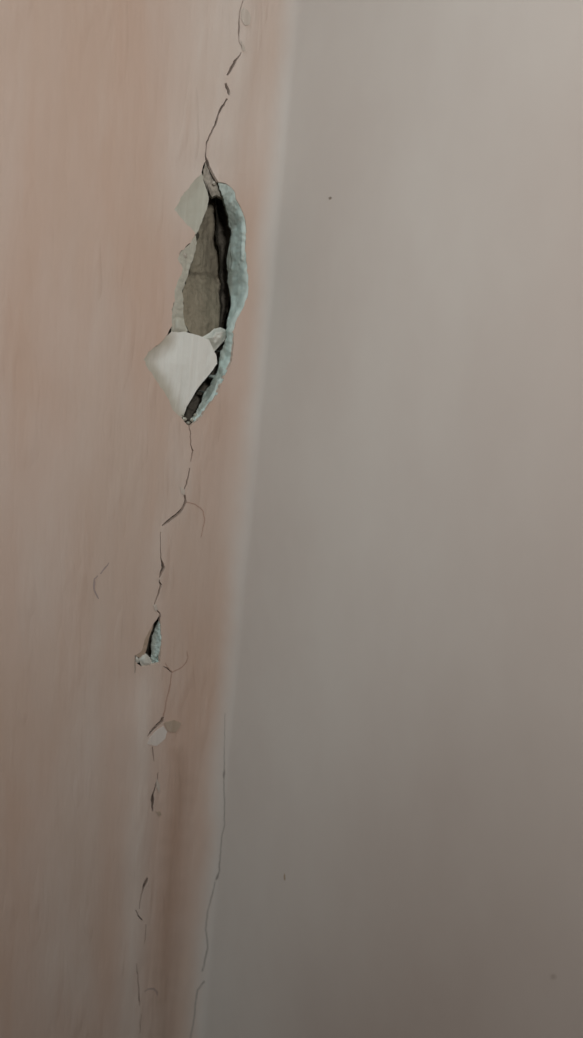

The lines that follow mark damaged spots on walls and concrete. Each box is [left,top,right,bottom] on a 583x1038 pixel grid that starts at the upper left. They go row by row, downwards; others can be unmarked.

spalling [144,161,249,425]
crack [165,487,205,536]
spalling [134,617,161,670]
crack [147,654,188,746]
crack [190,718,225,1038]